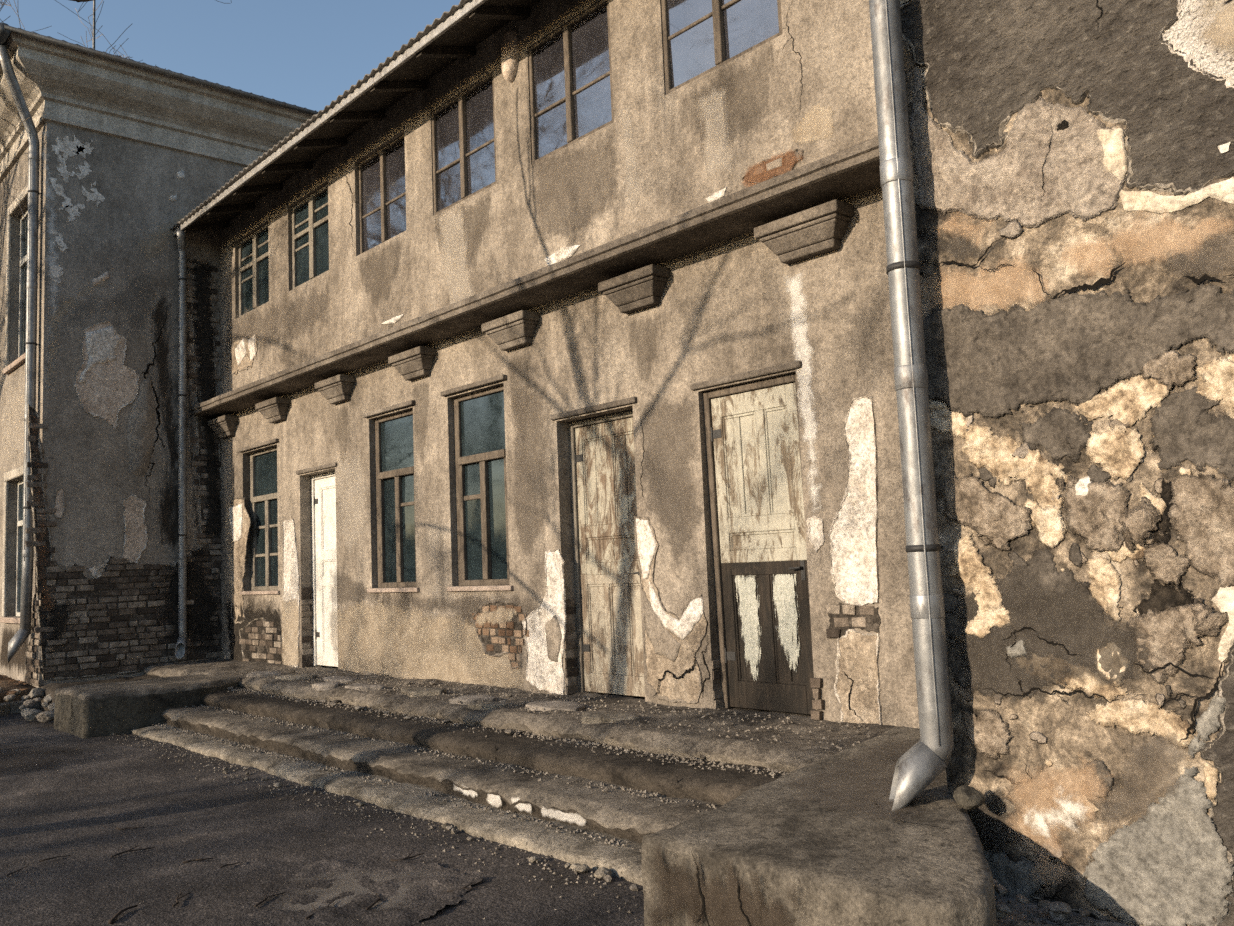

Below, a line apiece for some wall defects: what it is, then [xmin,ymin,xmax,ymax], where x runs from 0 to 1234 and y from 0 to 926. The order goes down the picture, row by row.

leakage [537,147,613,231]
corrosion [743,151,797,187]
leakage [440,213,471,304]
crack [141,312,167,495]
spalling [24,259,313,687]
peeling [902,32,1234,926]
peeling [806,396,883,725]
peeling [330,549,580,695]
peeling [735,574,800,681]
crack [985,627,1126,706]
crack [1138,657,1228,742]
crack [691,851,710,926]